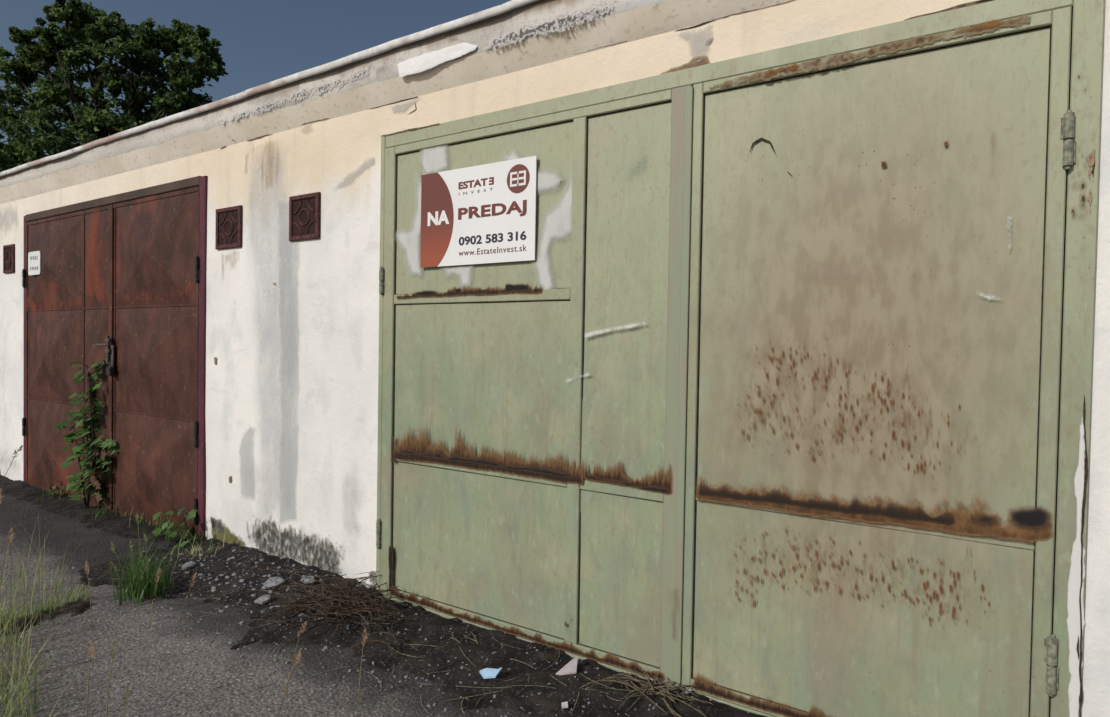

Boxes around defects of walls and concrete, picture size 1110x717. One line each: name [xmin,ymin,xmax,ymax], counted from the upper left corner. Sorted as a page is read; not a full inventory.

rust [709,15,1031,89]
rust [77,213,104,303]
rust [397,284,542,299]
rust [738,338,961,478]
leakage [248,443,342,573]
rust [391,428,672,495]
rust [696,477,1053,542]
rust [388,546,664,681]
rust [734,529,967,625]
peeling [1067,417,1085,717]